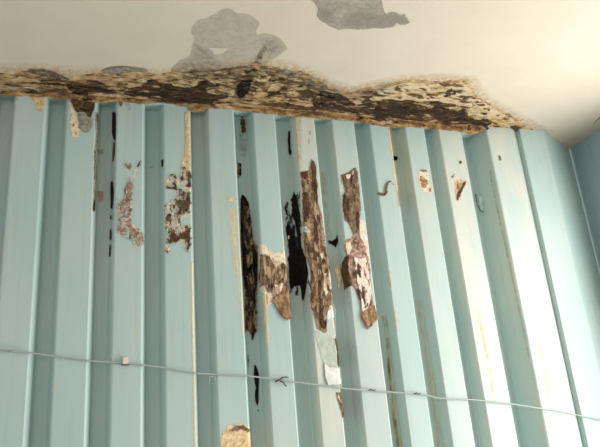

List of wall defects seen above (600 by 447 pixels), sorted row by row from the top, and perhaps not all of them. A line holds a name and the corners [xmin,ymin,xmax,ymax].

spalling [0,8,534,138]
peeling [116,161,145,247]
peeling [164,111,192,254]
peeling [418,170,433,194]
peeling [452,174,467,201]
peeling [258,243,292,320]
peeling [300,159,379,387]
peeling [221,424,251,447]